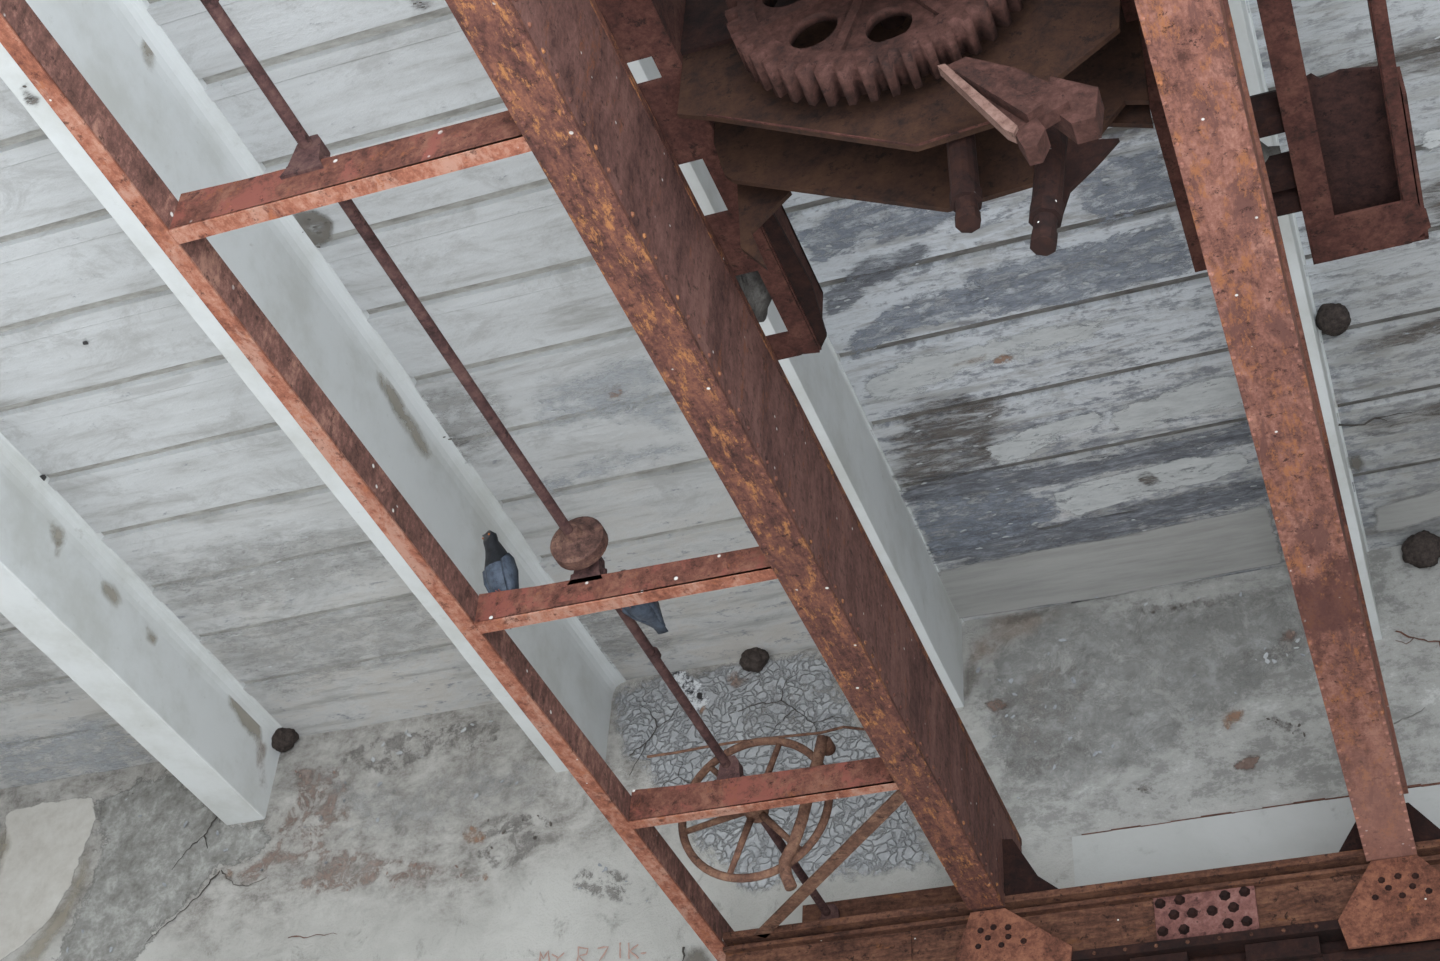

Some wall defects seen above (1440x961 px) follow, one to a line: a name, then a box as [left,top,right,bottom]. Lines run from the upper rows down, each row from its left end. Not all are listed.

peeling [797,202,955,315]
peeling [844,143,1192,357]
peeling [1370,317,1440,354]
peeling [865,315,1282,618]
peeling [1375,490,1440,532]
crack [1395,631,1440,646]
crack [148,816,267,940]
spalling [0,720,497,961]
crack [1081,795,1349,835]
crack [1407,781,1440,789]